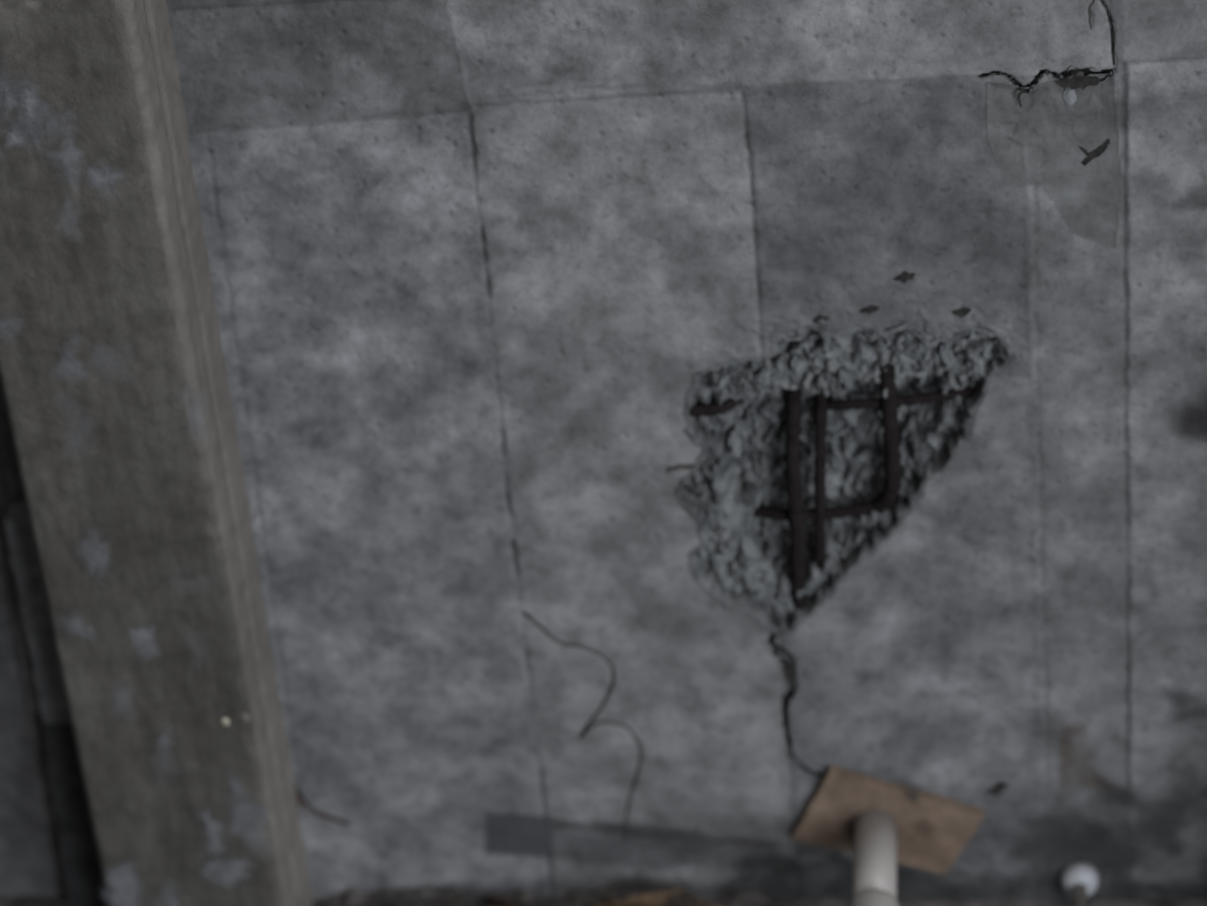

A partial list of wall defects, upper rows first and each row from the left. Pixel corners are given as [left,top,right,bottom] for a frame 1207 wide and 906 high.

crack [978,0,1115,108]
crack [1079,139,1110,166]
spalling [893,271,915,283]
spalling [674,305,1017,636]
crack [522,612,642,840]
crack [765,619,824,777]